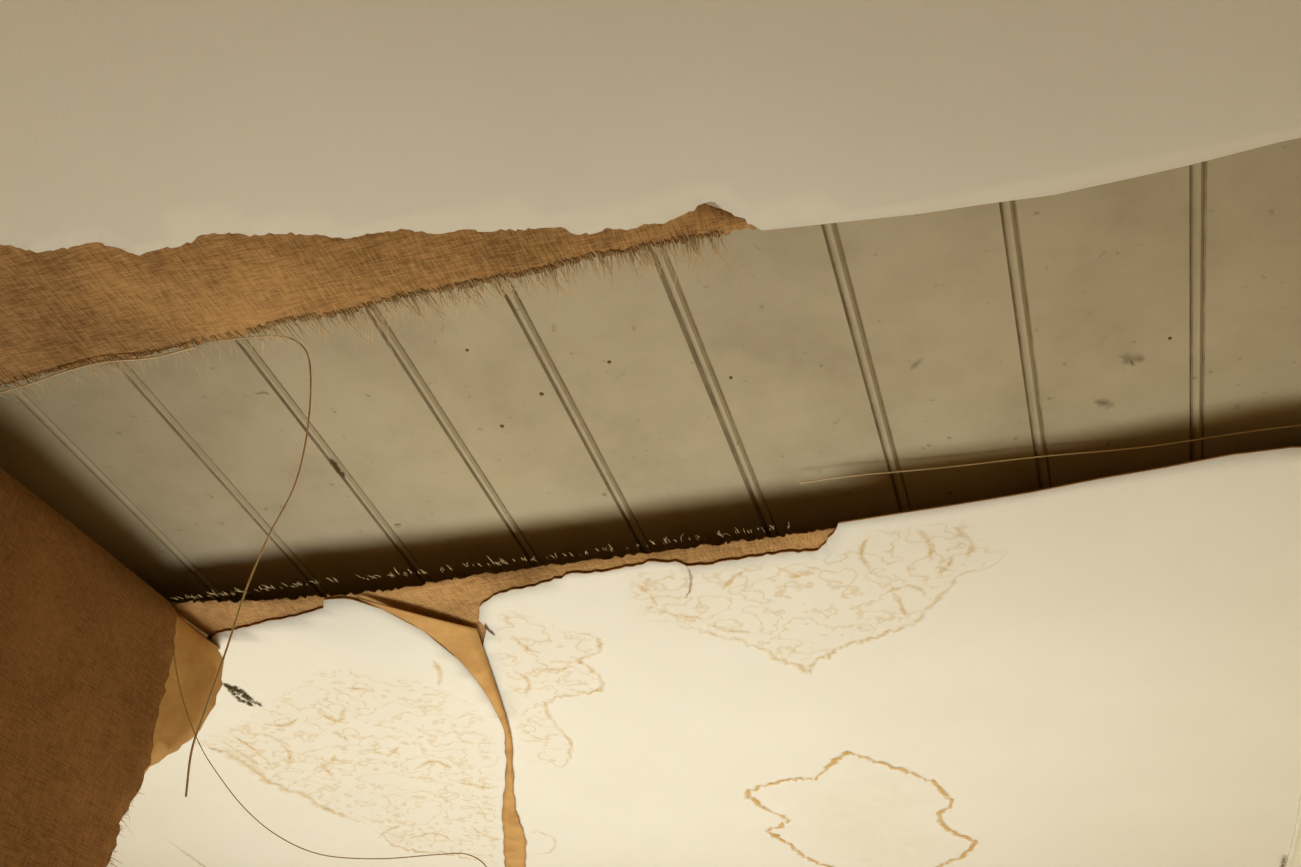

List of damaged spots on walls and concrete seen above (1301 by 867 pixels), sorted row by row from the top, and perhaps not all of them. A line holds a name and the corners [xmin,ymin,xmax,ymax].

peeling [0,468,224,867]
leakage [223,684,262,707]
peeling [356,597,527,867]
leakage [746,752,977,867]